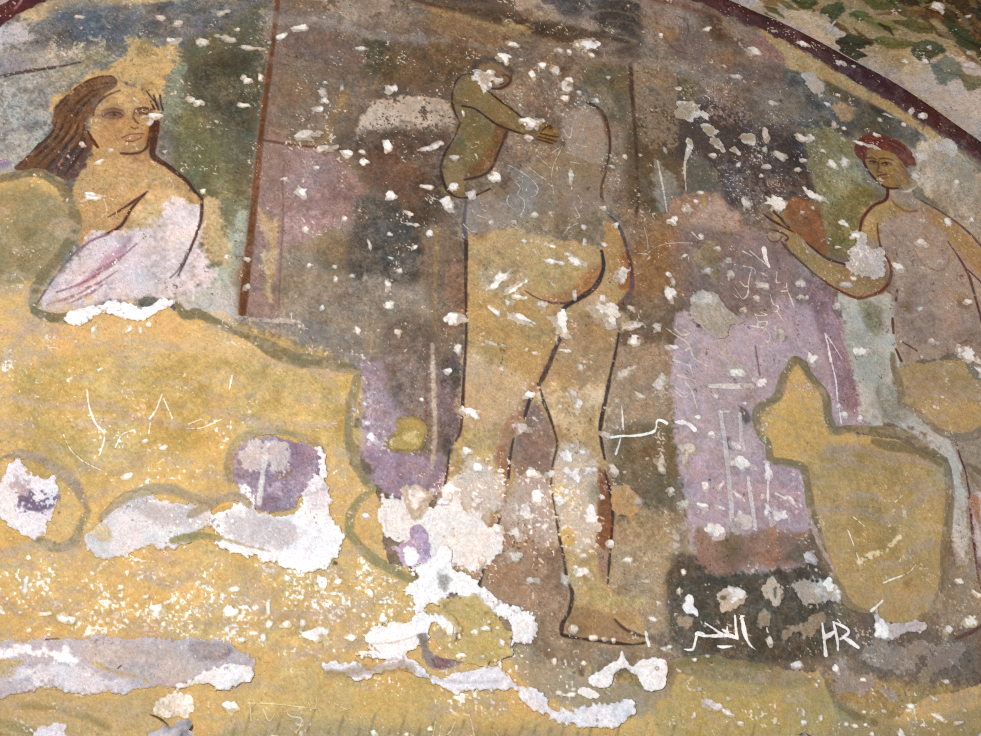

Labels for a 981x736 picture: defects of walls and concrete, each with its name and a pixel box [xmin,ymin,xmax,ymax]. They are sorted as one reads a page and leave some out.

peeling [468,40,521,93]
peeling [528,62,600,104]
peeling [554,37,602,59]
peeling [517,103,546,142]
peeling [673,86,808,178]
peeling [741,194,788,214]
flaking render [828,219,905,288]
flaking render [63,297,176,339]
peeling [485,269,663,353]
flaking render [168,443,683,731]
flaking render [790,609,979,727]
flaking render [152,688,195,719]